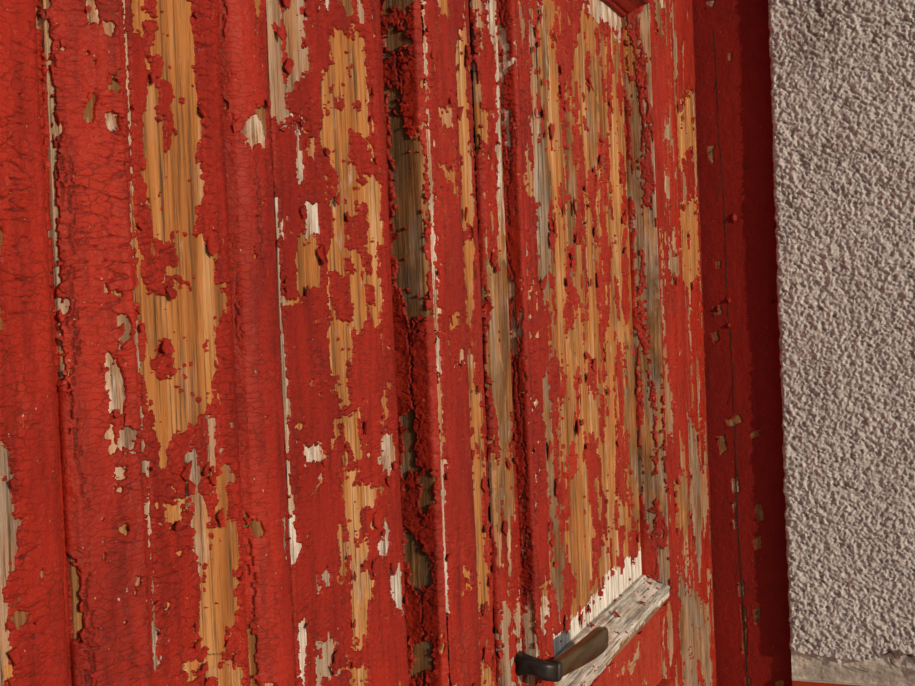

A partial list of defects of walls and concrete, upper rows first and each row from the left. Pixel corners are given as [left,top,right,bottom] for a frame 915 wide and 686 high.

peeling [35,0,70,379]
peeling [83,93,95,123]
peeling [85,0,279,686]
peeling [232,0,714,686]
peeling [0,441,40,686]
peeling [67,555,86,644]